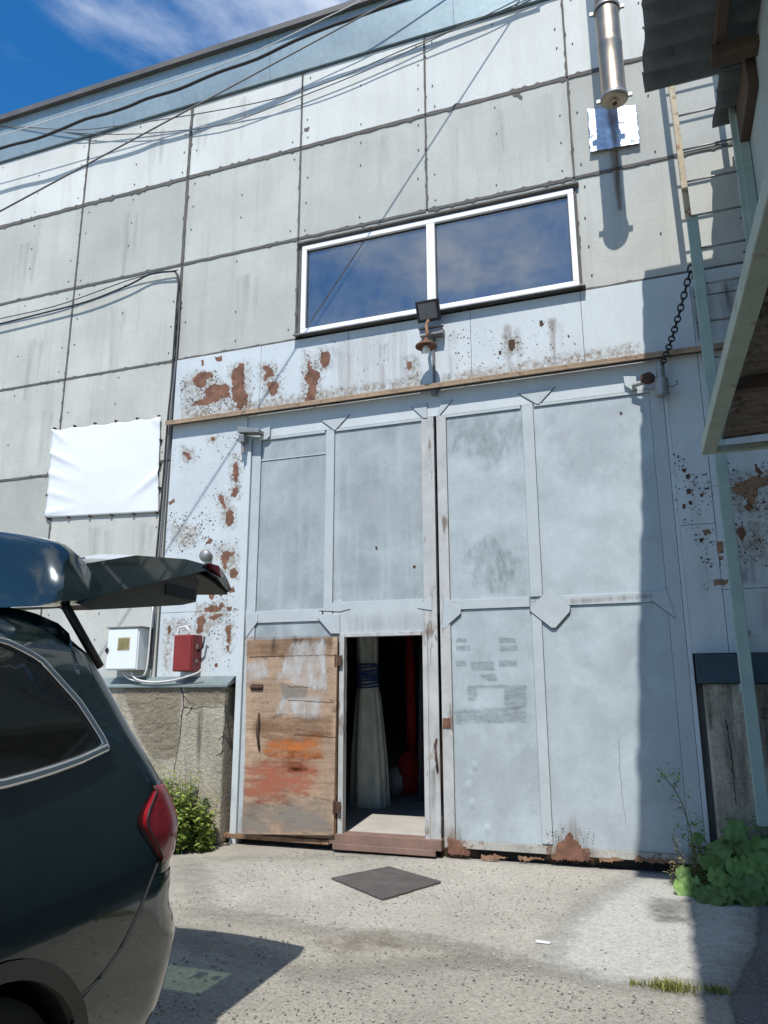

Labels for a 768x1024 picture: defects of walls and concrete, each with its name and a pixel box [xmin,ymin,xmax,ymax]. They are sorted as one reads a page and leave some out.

crack [126,682,227,772]
corrosion [447,828,678,866]